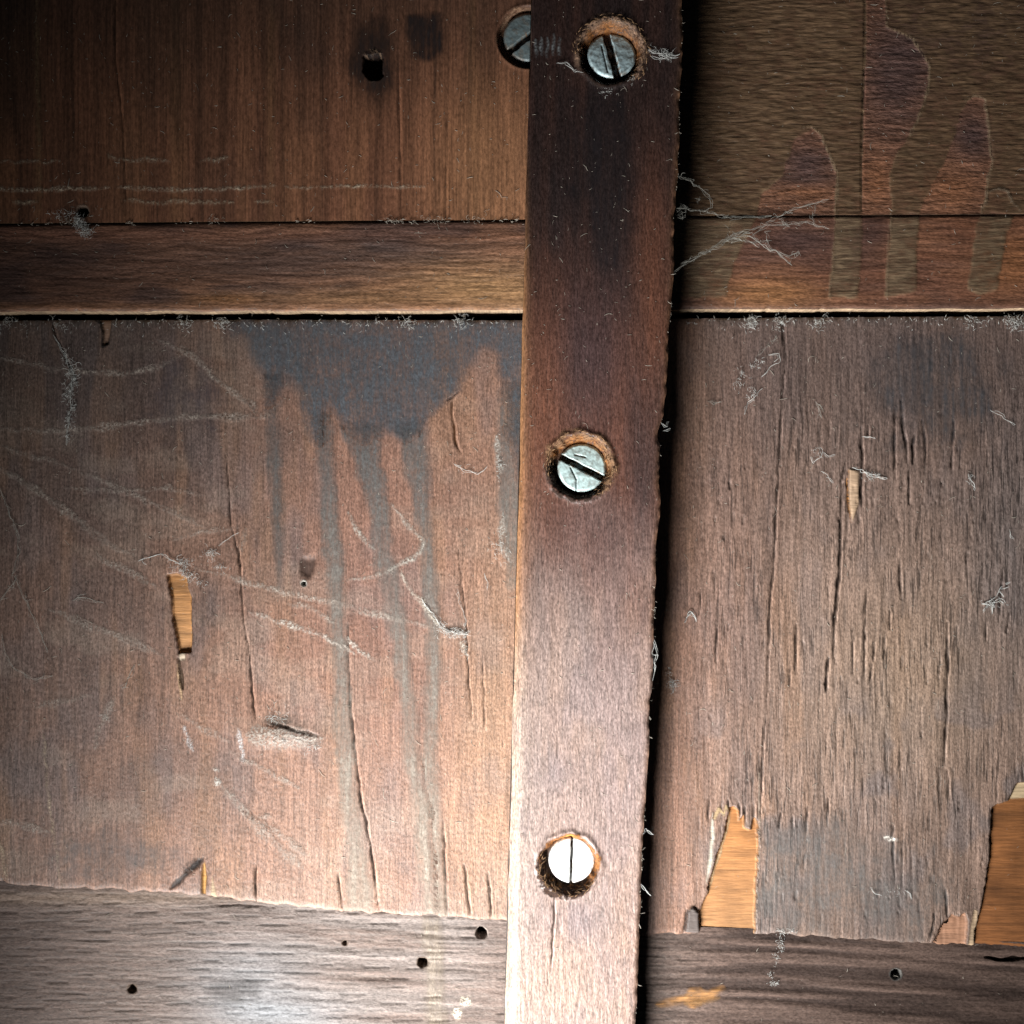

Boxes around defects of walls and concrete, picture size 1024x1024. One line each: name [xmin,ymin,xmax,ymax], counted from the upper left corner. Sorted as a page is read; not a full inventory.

peeling [168,573,193,699]
crack [228,480,245,629]
crack [248,656,256,715]
damp [301,414,372,908]
crack [348,631,378,903]
damp [341,425,446,1024]
crack [824,426,901,690]
peeling [683,798,761,933]
peeling [934,782,1024,946]